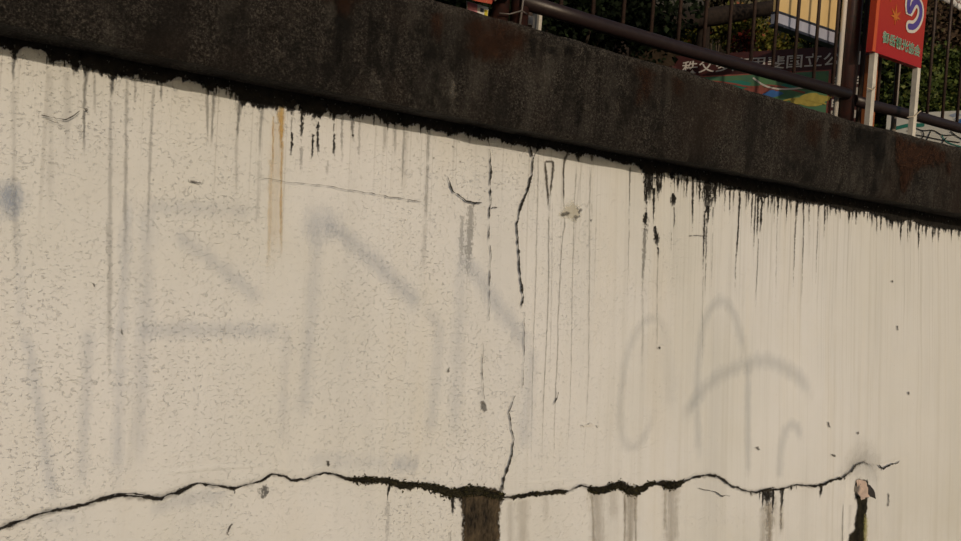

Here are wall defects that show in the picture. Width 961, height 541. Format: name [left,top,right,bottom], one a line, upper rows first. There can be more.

damp [0,36,961,273]
crack [448,143,626,499]
crack [0,472,454,530]
damp [451,487,503,541]
crack [650,461,899,497]
damp [849,493,868,541]